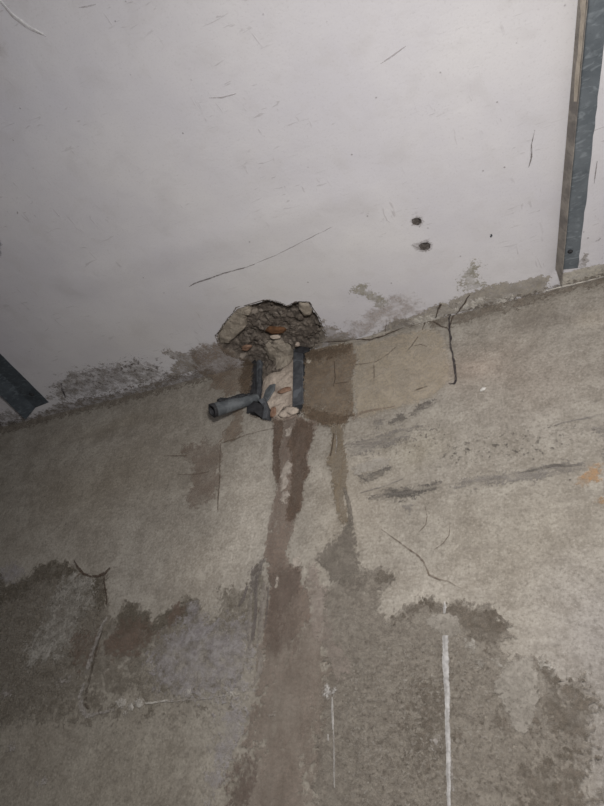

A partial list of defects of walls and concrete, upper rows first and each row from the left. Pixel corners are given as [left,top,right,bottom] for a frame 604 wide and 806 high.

crack [189,228,329,287]
leakage [0,343,254,434]
spalling [215,274,552,423]
crack [328,295,470,384]
leakage [301,284,604,806]
leakage [0,558,269,785]